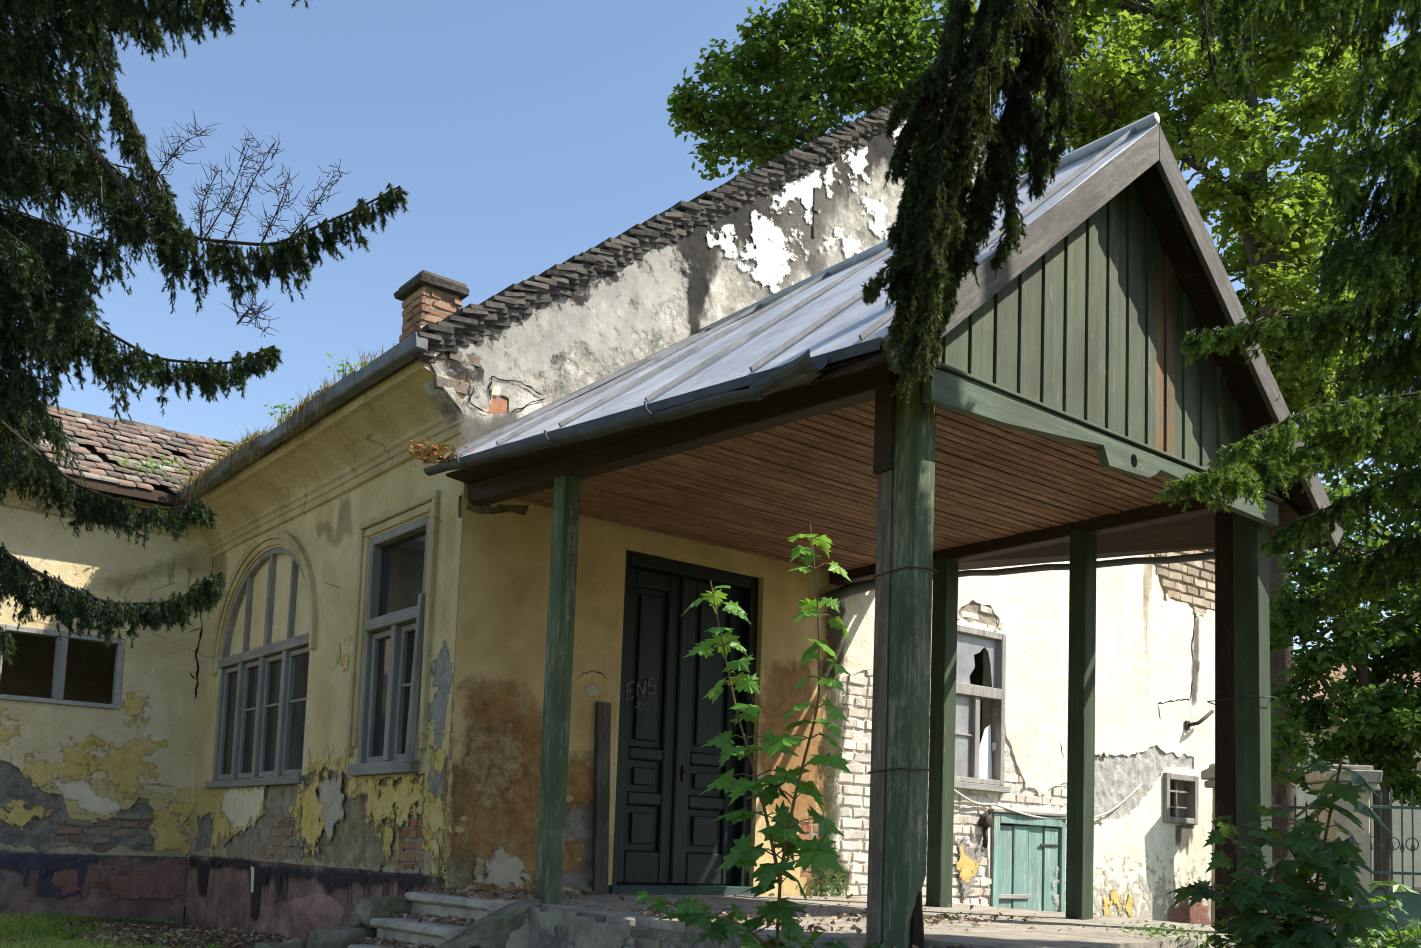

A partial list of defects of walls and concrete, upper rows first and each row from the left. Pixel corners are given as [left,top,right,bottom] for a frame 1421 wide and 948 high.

crack [469,376,545,413]
peeling [430,241,691,414]
water stain [429,131,897,381]
peeling [706,145,889,294]
flaking render [958,601,1003,631]
flaking render [1150,549,1215,617]
water stain [0,849,99,899]
flaking render [0,636,535,900]
water stain [190,856,423,920]
flaking render [799,667,873,896]
flaking render [952,737,1067,906]
flaking render [1094,746,1193,824]